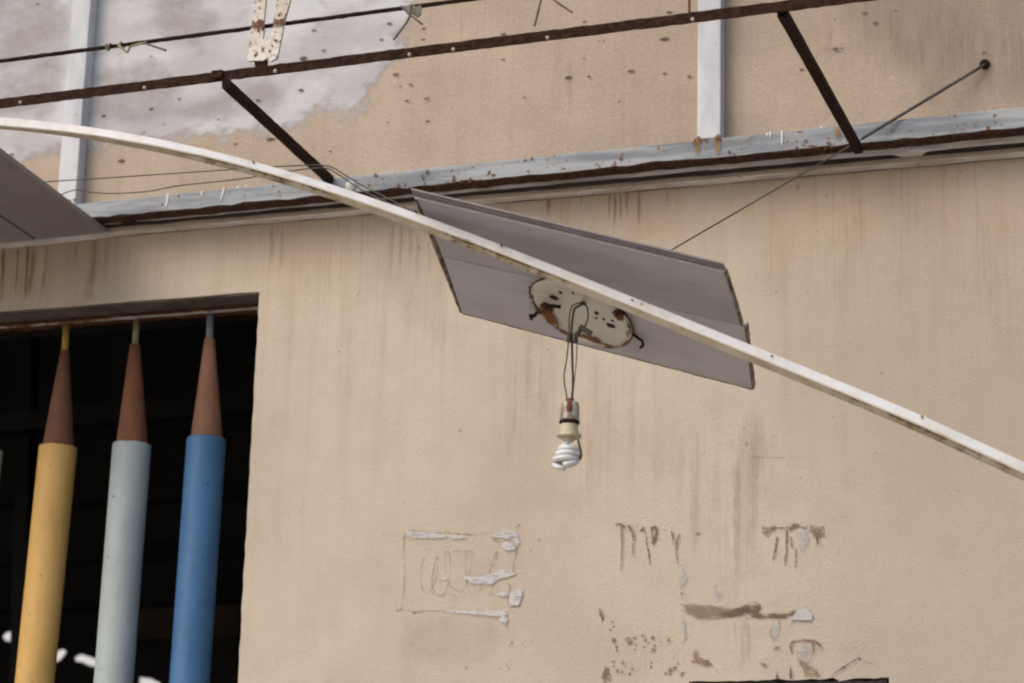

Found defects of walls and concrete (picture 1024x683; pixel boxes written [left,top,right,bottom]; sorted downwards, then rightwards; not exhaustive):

peeling [0,0,73,163]
peeling [87,0,413,153]
corrosion [0,0,875,109]
corrosion [205,158,284,184]
corrosion [693,134,742,156]
corrosion [446,233,631,349]
peeling [599,608,670,683]
spalling [789,639,823,677]